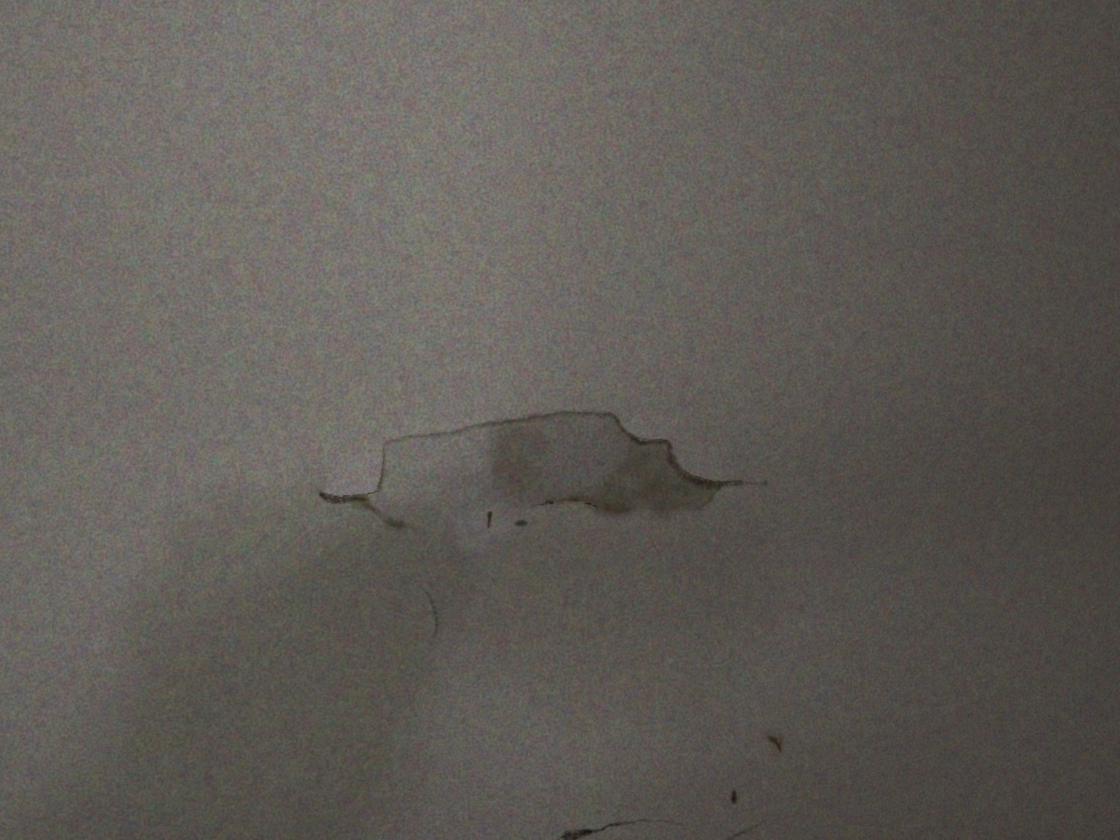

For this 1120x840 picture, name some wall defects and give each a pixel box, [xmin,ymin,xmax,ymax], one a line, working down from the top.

flaking render [318,411,742,527]
crack [563,823,619,840]